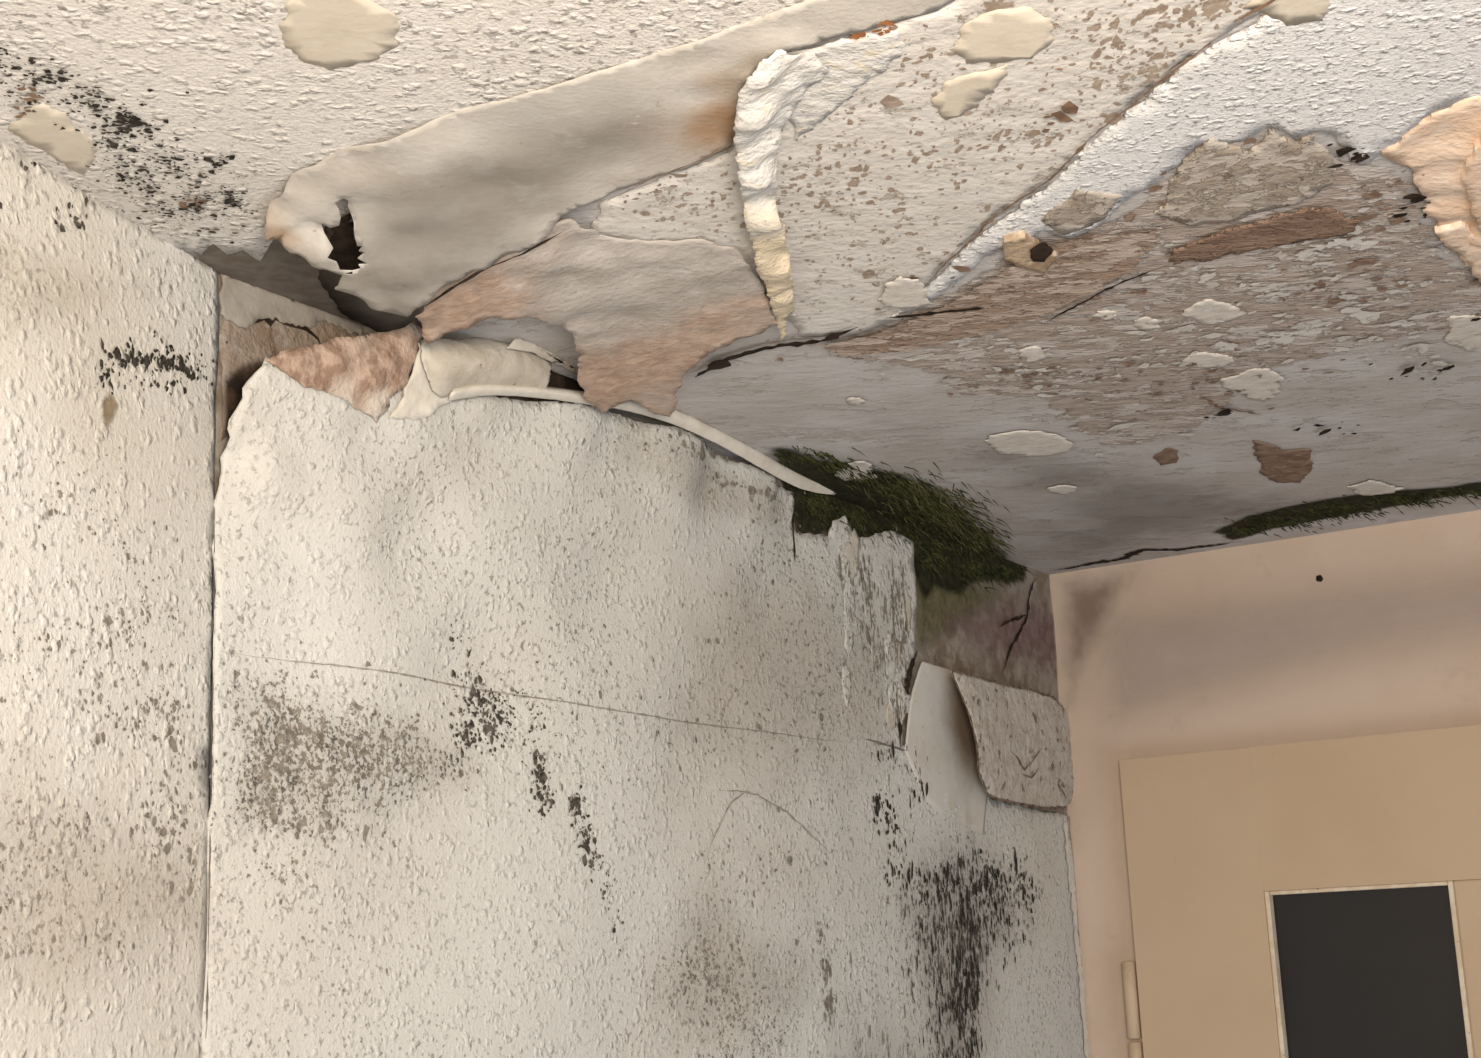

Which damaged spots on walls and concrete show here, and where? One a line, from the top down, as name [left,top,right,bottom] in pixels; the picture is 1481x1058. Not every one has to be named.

peeling [279,0,400,71]
damp [0,45,258,244]
peeling [589,144,770,301]
flaking render [776,0,1481,465]
damp [95,330,263,430]
flaking render [219,274,378,442]
peeling [835,461,877,482]
peeling [1252,422,1359,483]
peeling [1347,480,1404,496]
damp [521,429,872,776]
damp [0,430,635,974]
damp [868,723,1050,1058]